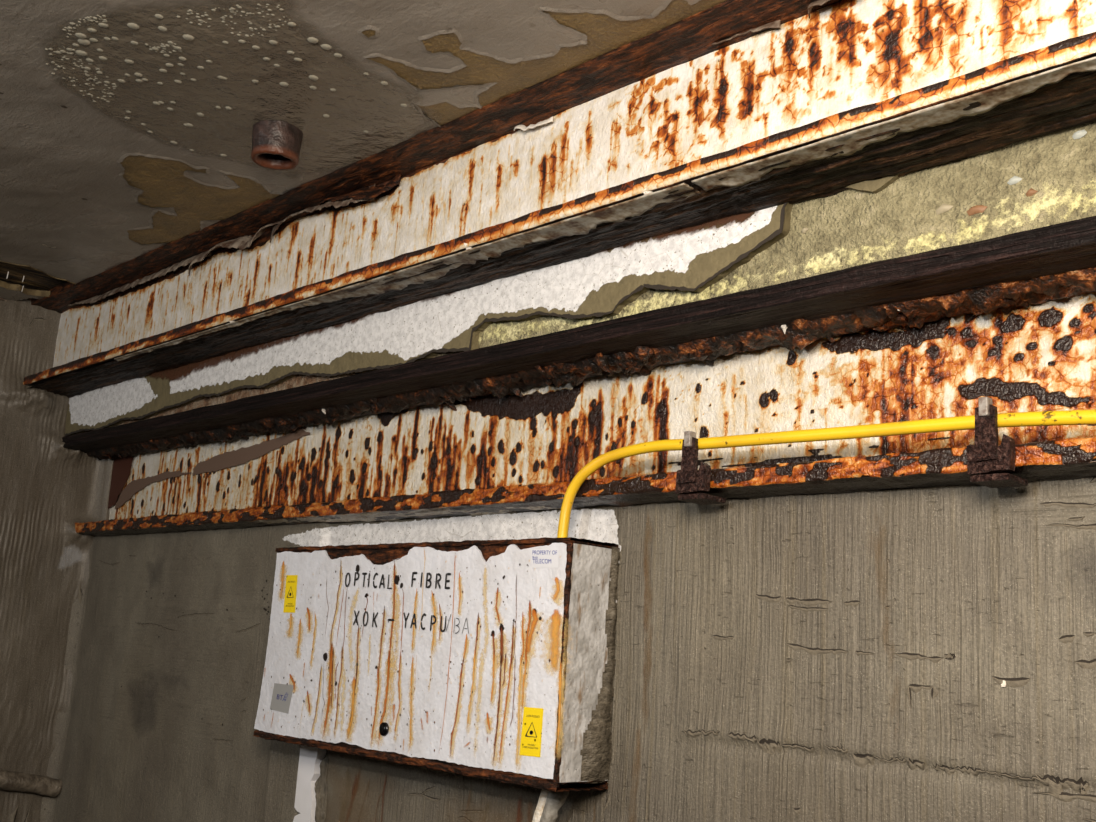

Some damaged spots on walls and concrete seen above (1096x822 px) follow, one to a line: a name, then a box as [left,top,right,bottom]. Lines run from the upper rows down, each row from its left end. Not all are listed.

damp [45,0,430,177]
peeling [362,0,727,127]
spalling [0,261,75,302]
peeling [117,153,288,245]
peeling [69,206,777,427]
rust [27,71,1096,398]